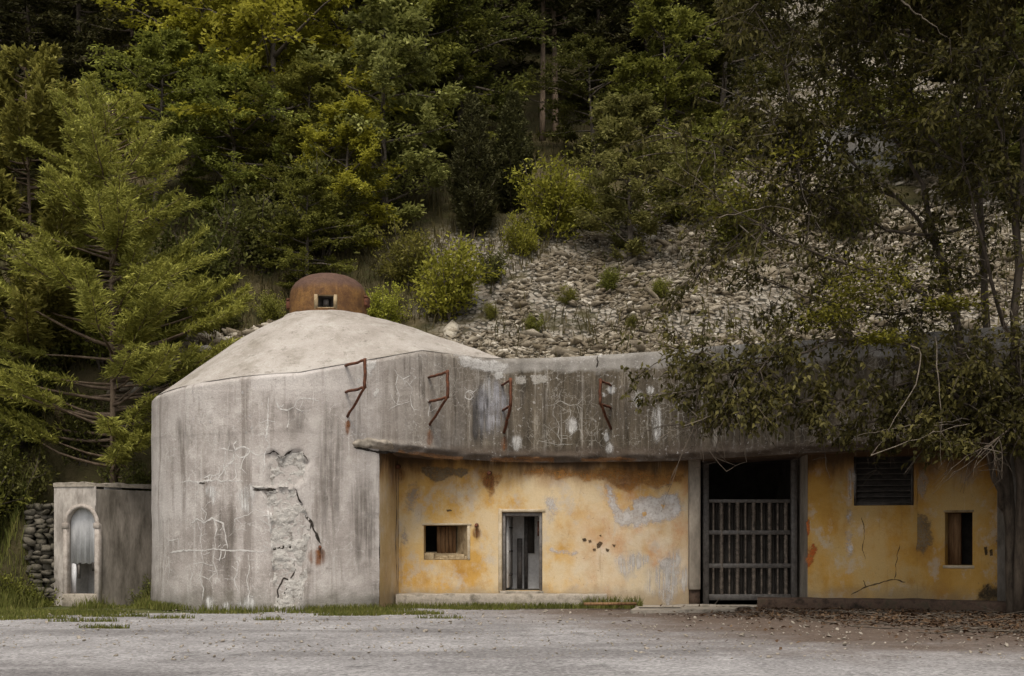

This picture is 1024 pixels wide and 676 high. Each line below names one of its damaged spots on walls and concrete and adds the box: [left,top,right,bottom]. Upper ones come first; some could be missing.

crack [165,397,321,602]
spalling [252,450,311,609]
water stain [421,467,468,481]
water stain [525,467,683,491]
peeling [608,487,681,527]
crack [851,517,903,595]